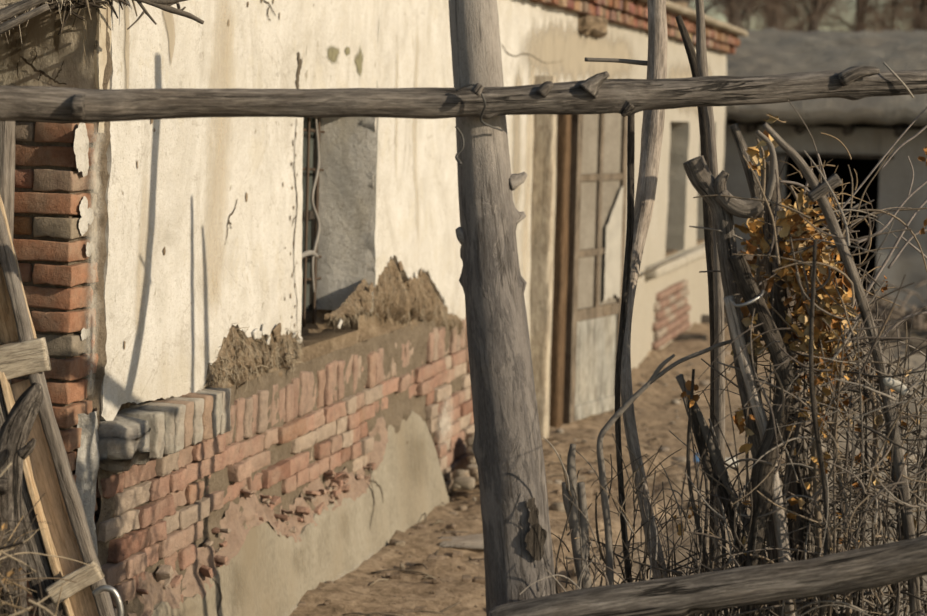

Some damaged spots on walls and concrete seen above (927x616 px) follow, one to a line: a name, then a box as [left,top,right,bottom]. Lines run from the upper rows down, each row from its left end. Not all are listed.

crack [16,48,66,85]
peeling [328,46,363,74]
peeling [79,196,94,257]
spalling [314,259,465,343]
spalling [203,323,305,402]
spalling [128,417,388,616]